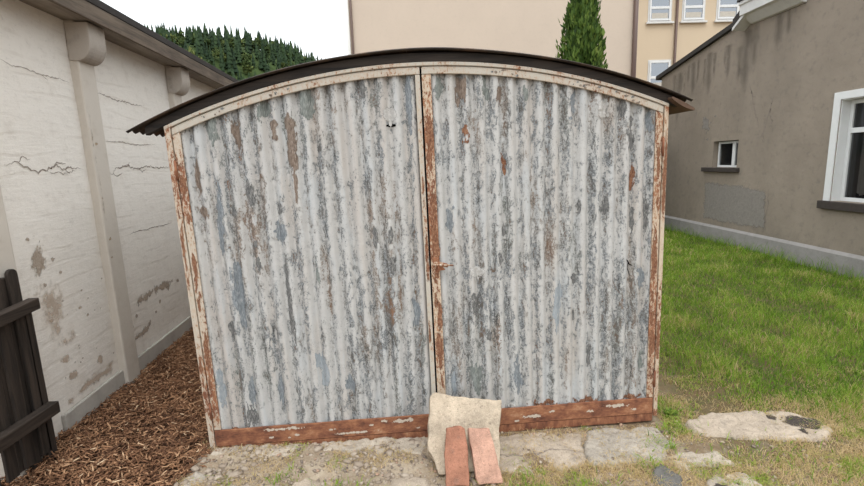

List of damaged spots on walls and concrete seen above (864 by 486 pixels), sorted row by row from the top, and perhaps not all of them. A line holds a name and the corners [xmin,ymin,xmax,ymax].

crack [1,59,69,83]
crack [8,156,77,175]
crack [106,141,170,176]
corrosion [178,210,202,312]
corrosion [198,332,212,390]
peeling [189,160,237,255]
peeling [228,251,248,343]
peeling [274,198,297,346]
peeling [256,88,317,203]
corrosion [422,116,445,388]
peeling [629,192,651,239]
corrosion [648,291,660,379]